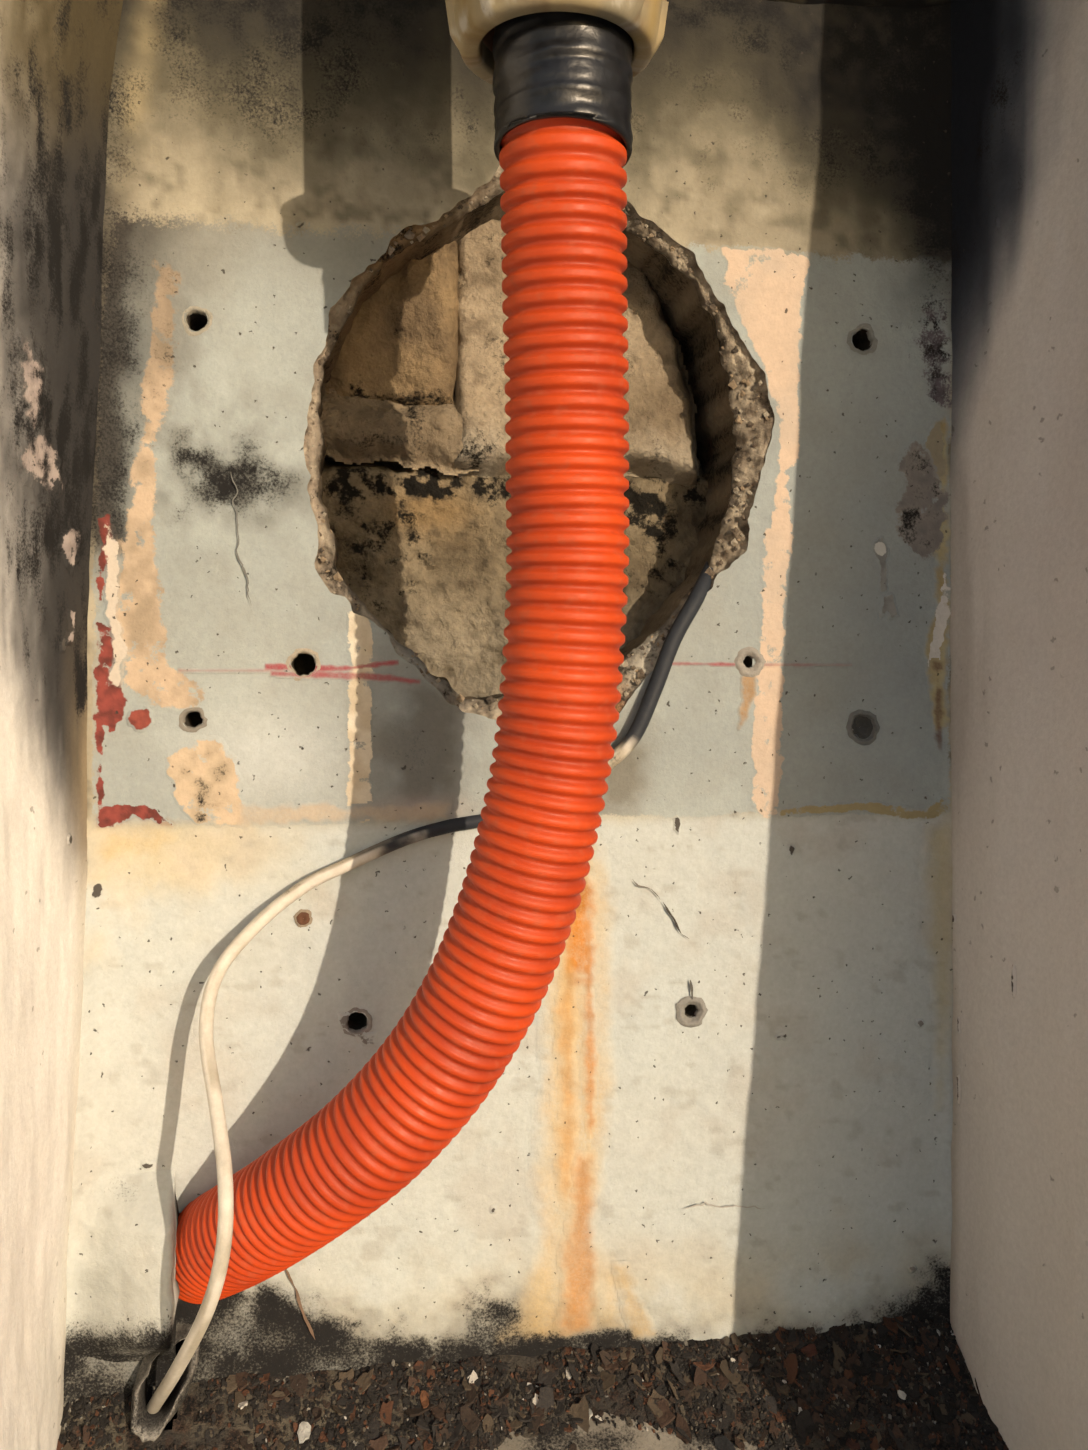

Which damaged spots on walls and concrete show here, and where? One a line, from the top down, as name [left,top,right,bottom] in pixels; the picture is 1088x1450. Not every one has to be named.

peeling [9,327,75,507]
spalling [57,165,512,830]
spalling [615,201,813,822]
peeling [871,271,952,667]
rust [489,826,660,1351]